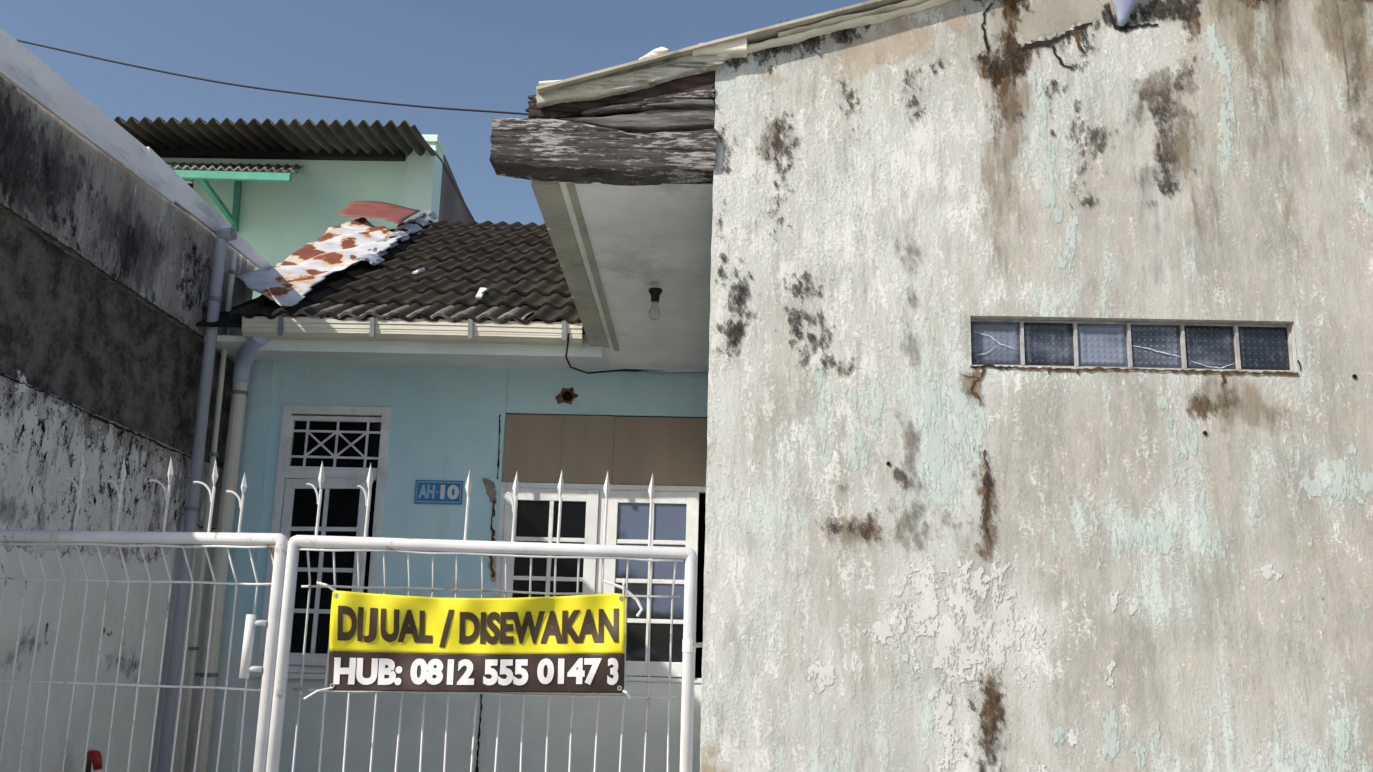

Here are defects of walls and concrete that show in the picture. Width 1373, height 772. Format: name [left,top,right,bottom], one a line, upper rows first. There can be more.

crack [981,3,1100,71]
mould [0,85,211,314]
water stain [717,125,738,174]
mould [757,107,798,235]
water stain [1045,53,1202,223]
water stain [711,199,760,374]
water stain [783,266,854,377]
water stain [893,418,921,491]
water stain [964,674,1008,772]